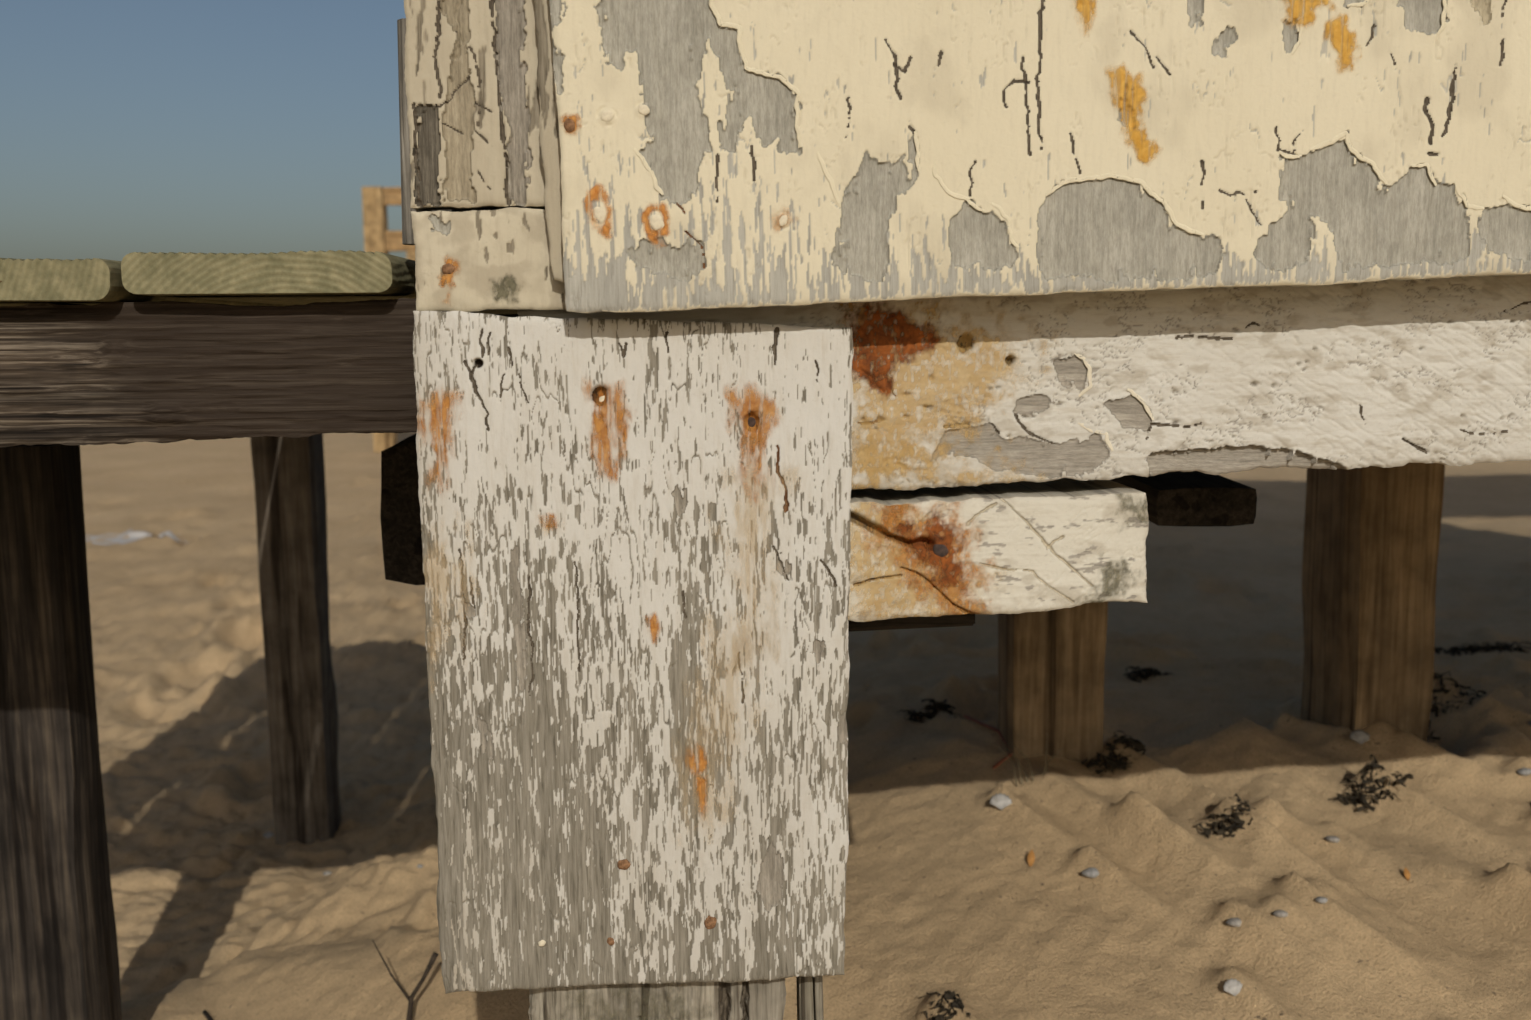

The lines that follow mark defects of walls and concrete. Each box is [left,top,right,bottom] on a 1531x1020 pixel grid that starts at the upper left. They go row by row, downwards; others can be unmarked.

peeling [549,0,568,95]
peeling [594,0,1226,284]
corrosion [585,185,611,236]
corrosion [642,204,668,244]
peeling [1253,131,1531,273]
corrosion [845,304,940,395]
corrosion [587,386,626,480]
corrosion [727,387,775,473]
peeling [772,546,792,579]
corrosion [877,505,985,615]
peeling [812,639,826,664]
crack [720,981,750,1020]